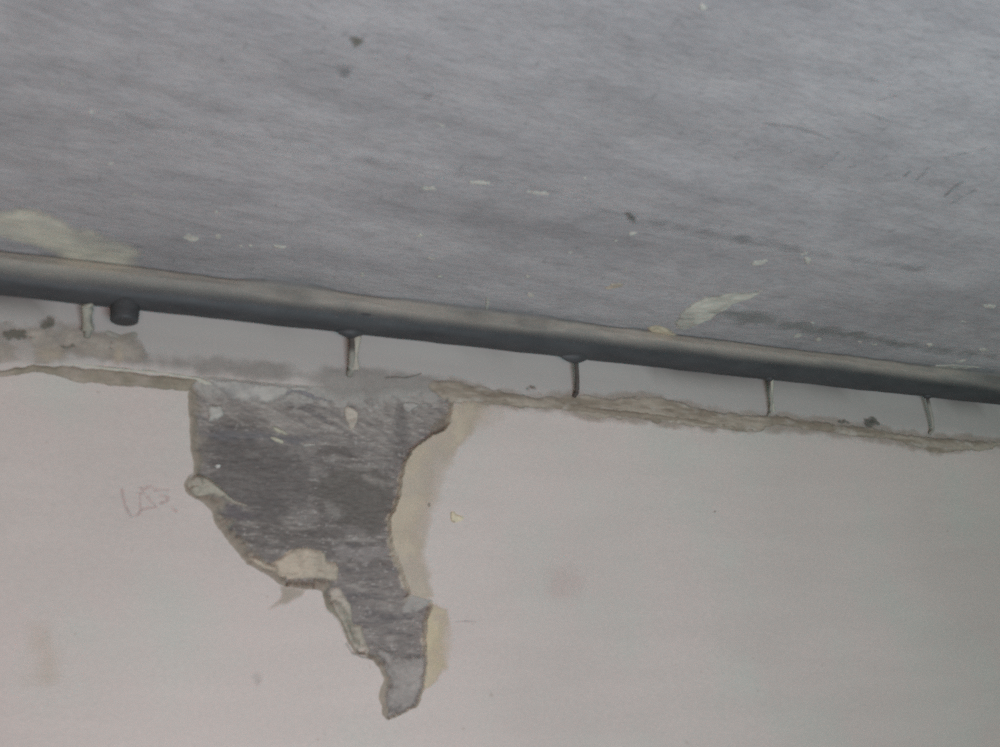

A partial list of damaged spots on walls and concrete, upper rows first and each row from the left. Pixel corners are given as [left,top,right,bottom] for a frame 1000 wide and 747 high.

flaking render [0,363,1000,720]